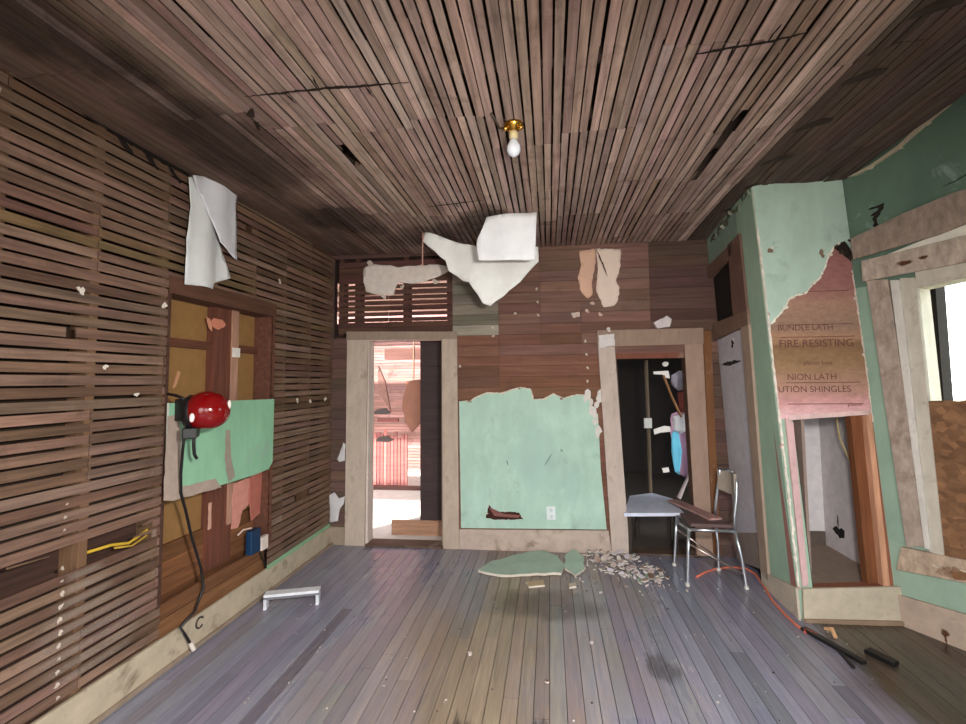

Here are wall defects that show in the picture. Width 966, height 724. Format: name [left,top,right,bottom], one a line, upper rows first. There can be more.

flaking render [363,260,448,299]
peeling [574,248,603,318]
flaking render [819,238,874,422]
peeling [462,387,602,438]
peeling [932,564,966,580]